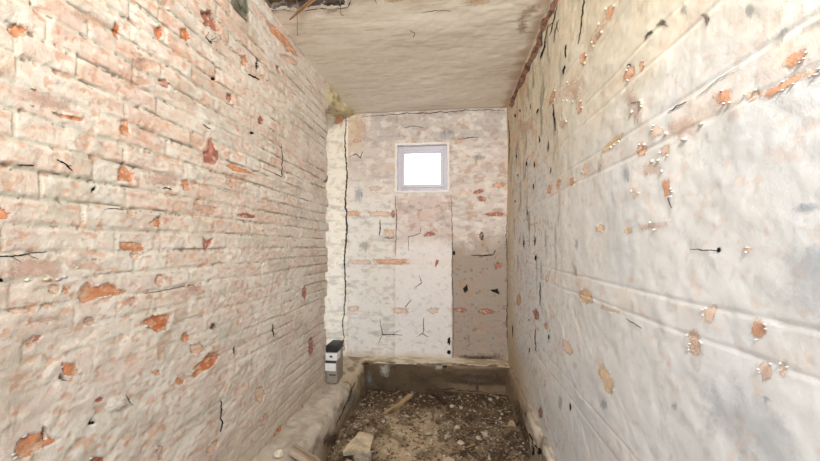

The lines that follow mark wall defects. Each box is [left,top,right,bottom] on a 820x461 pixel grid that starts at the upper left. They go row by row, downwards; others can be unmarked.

spalling [509,0,559,108]
crack [540,0,585,74]
spalling [743,49,820,101]
spalling [713,89,731,105]
crack [342,104,556,358]
crack [0,251,47,263]
flaking render [20,260,68,294]
spalling [78,282,136,307]
spalling [144,313,170,332]
spalling [176,333,218,385]
spalling [598,364,614,394]
spalling [11,431,55,461]